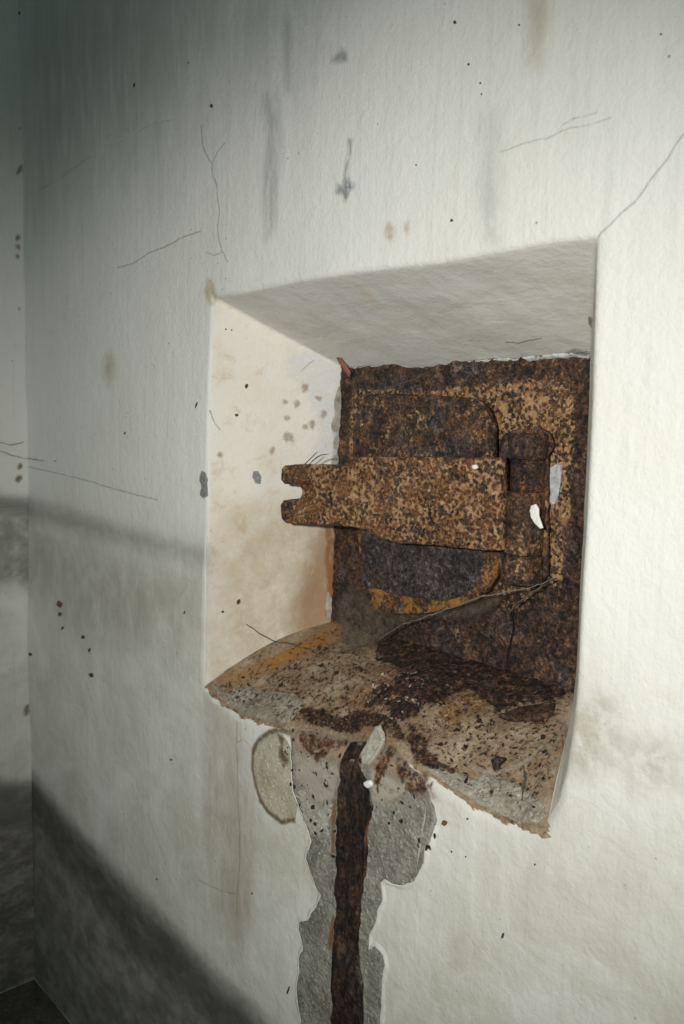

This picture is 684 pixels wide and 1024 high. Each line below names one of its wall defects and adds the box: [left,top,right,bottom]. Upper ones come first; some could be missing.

flaking render [209,685,545,1024]
corrosion [300,637,574,774]